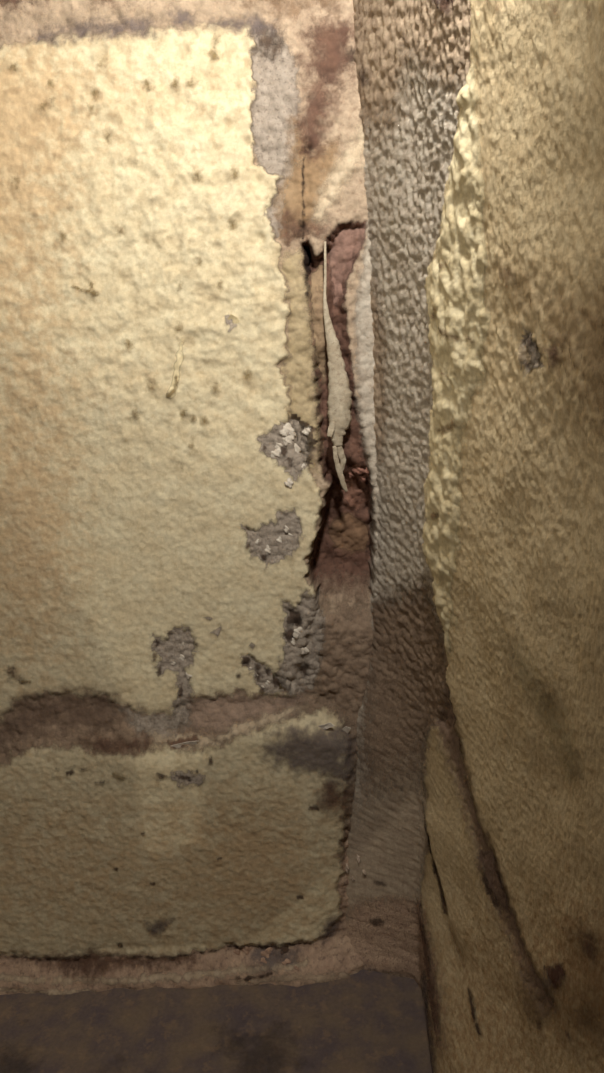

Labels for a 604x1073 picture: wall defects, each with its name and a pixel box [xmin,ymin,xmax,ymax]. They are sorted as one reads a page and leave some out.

flaking render [0,0,380,849]
flaking render [338,0,556,1012]
leakage [266,726,353,811]
spalling [0,872,364,995]
crack [415,823,481,1049]